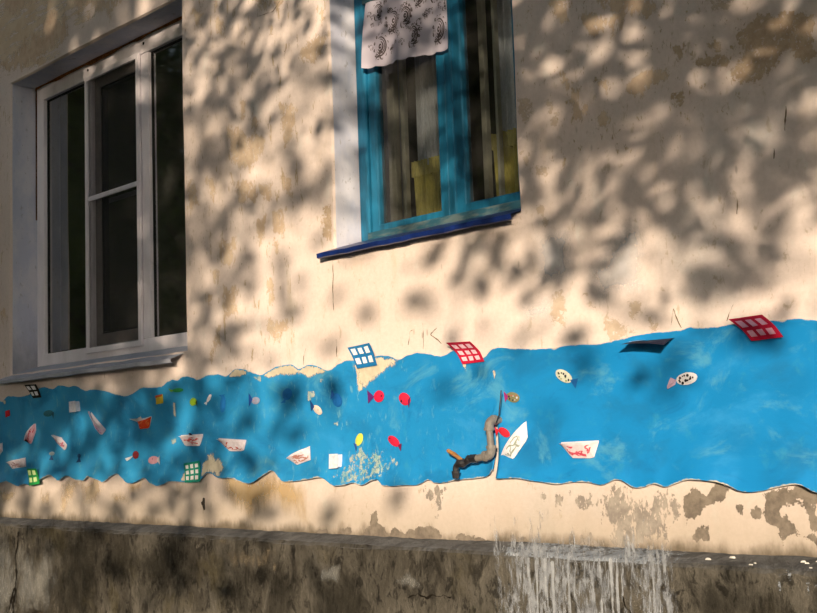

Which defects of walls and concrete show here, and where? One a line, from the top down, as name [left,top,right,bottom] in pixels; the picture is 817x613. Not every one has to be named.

peeling [284,33,327,63]
peeling [544,0,817,99]
peeling [517,63,632,155]
peeling [621,67,690,120]
peeling [194,54,312,371]
peeling [320,204,332,241]
peeling [541,482,730,551]
peeling [736,485,817,546]
leakage [494,533,681,613]